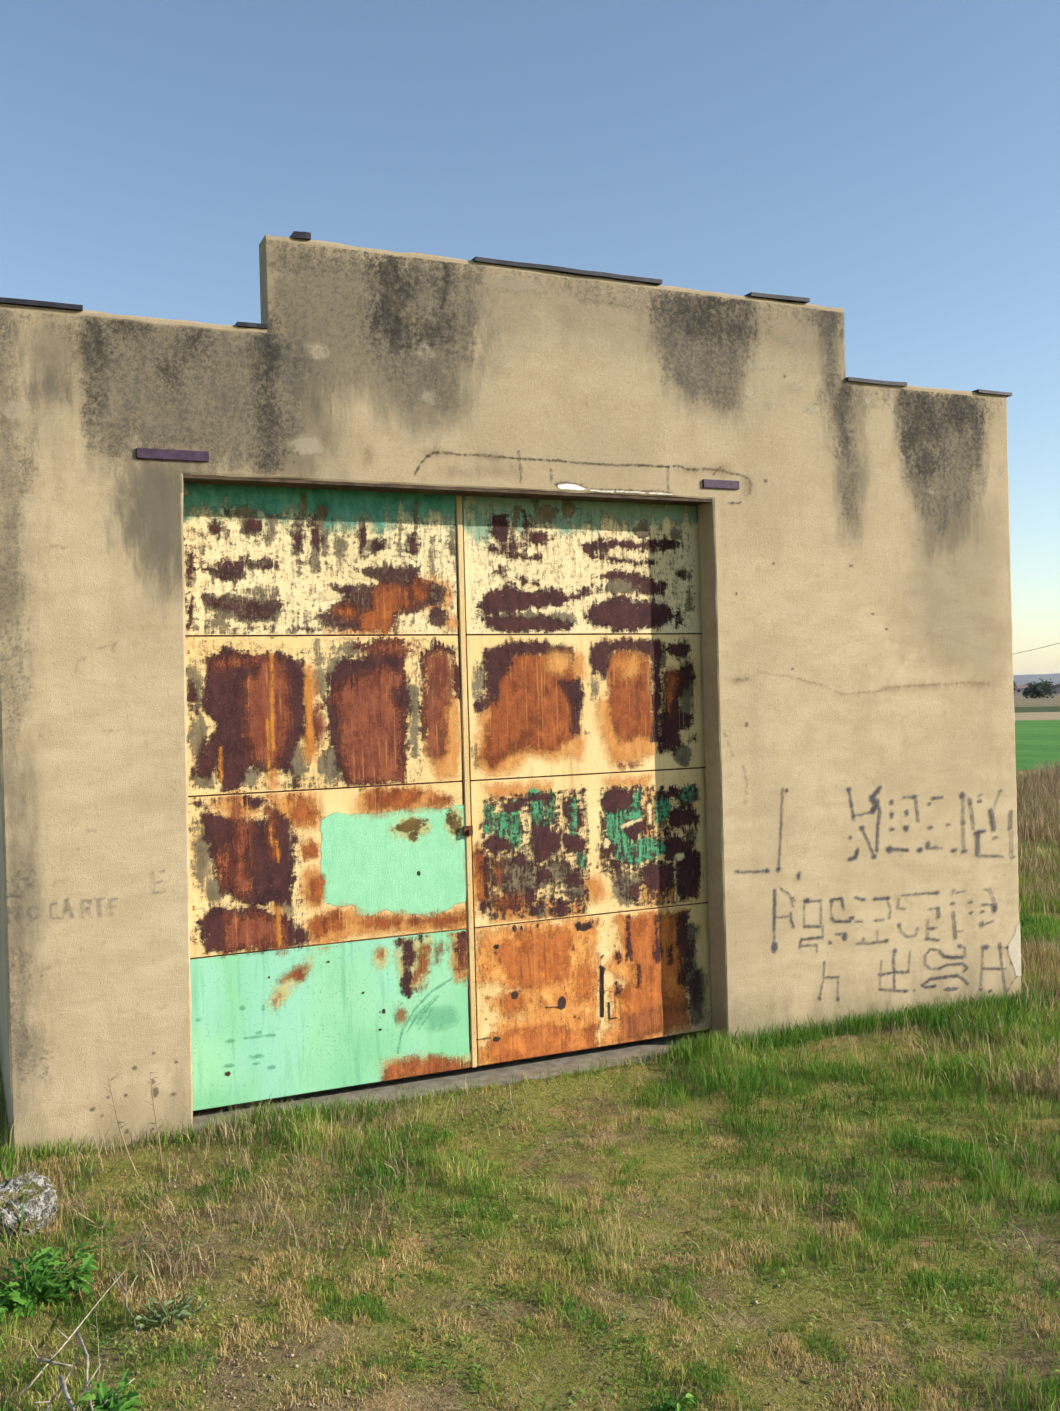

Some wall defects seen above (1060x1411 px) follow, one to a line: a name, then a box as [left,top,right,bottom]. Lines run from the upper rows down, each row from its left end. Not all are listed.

leakage [375,256,455,349]
leakage [651,291,756,410]
leakage [901,392,985,529]
rust [186,561,692,1081]
peeling [183,481,709,1025]